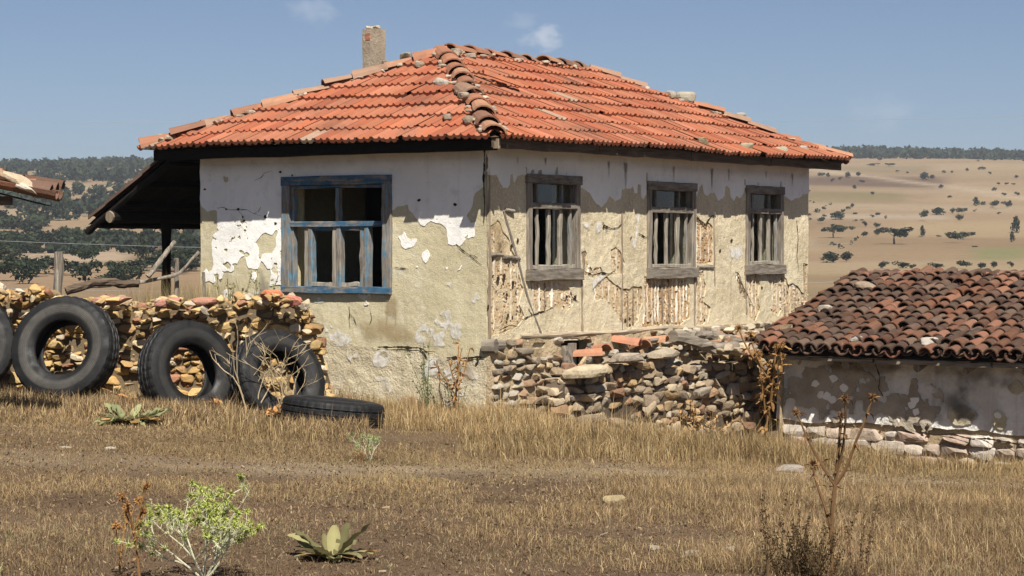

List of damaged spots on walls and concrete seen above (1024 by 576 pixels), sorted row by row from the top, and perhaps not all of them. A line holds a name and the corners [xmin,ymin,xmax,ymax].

peeling [200,170,809,410]
flaking render [783,360,977,433]